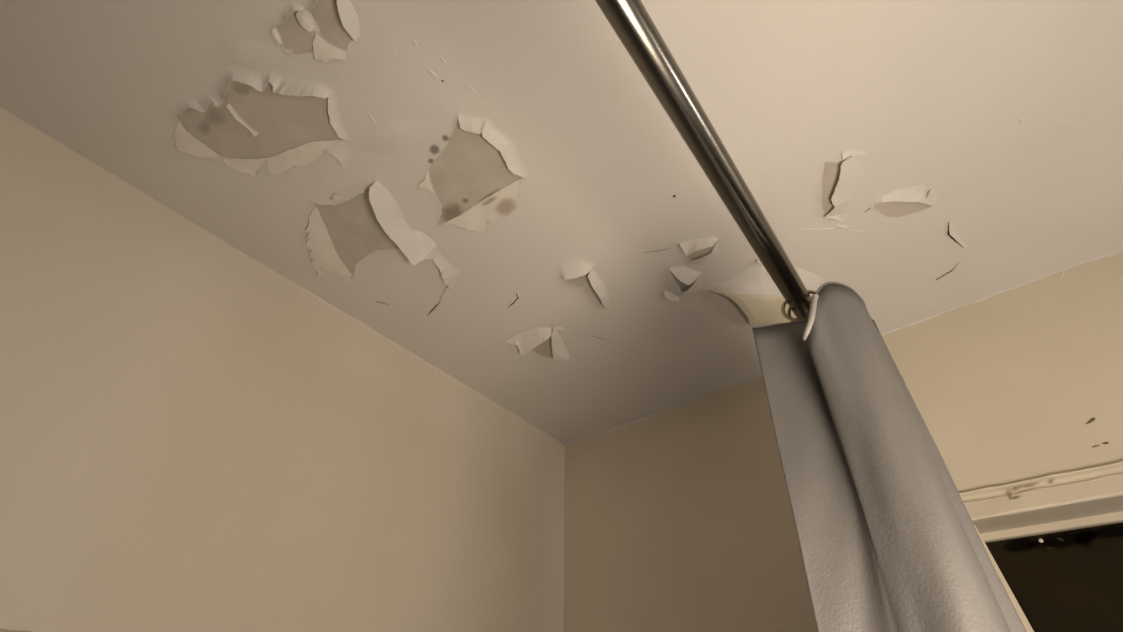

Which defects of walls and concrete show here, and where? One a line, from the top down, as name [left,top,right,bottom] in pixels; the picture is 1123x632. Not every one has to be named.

peeling [166,0,363,177]
peeling [305,110,532,318]
peeling [822,149,939,226]
peeling [554,255,613,314]
peeling [664,235,796,325]
peeling [794,266,825,297]
peeling [505,315,570,360]